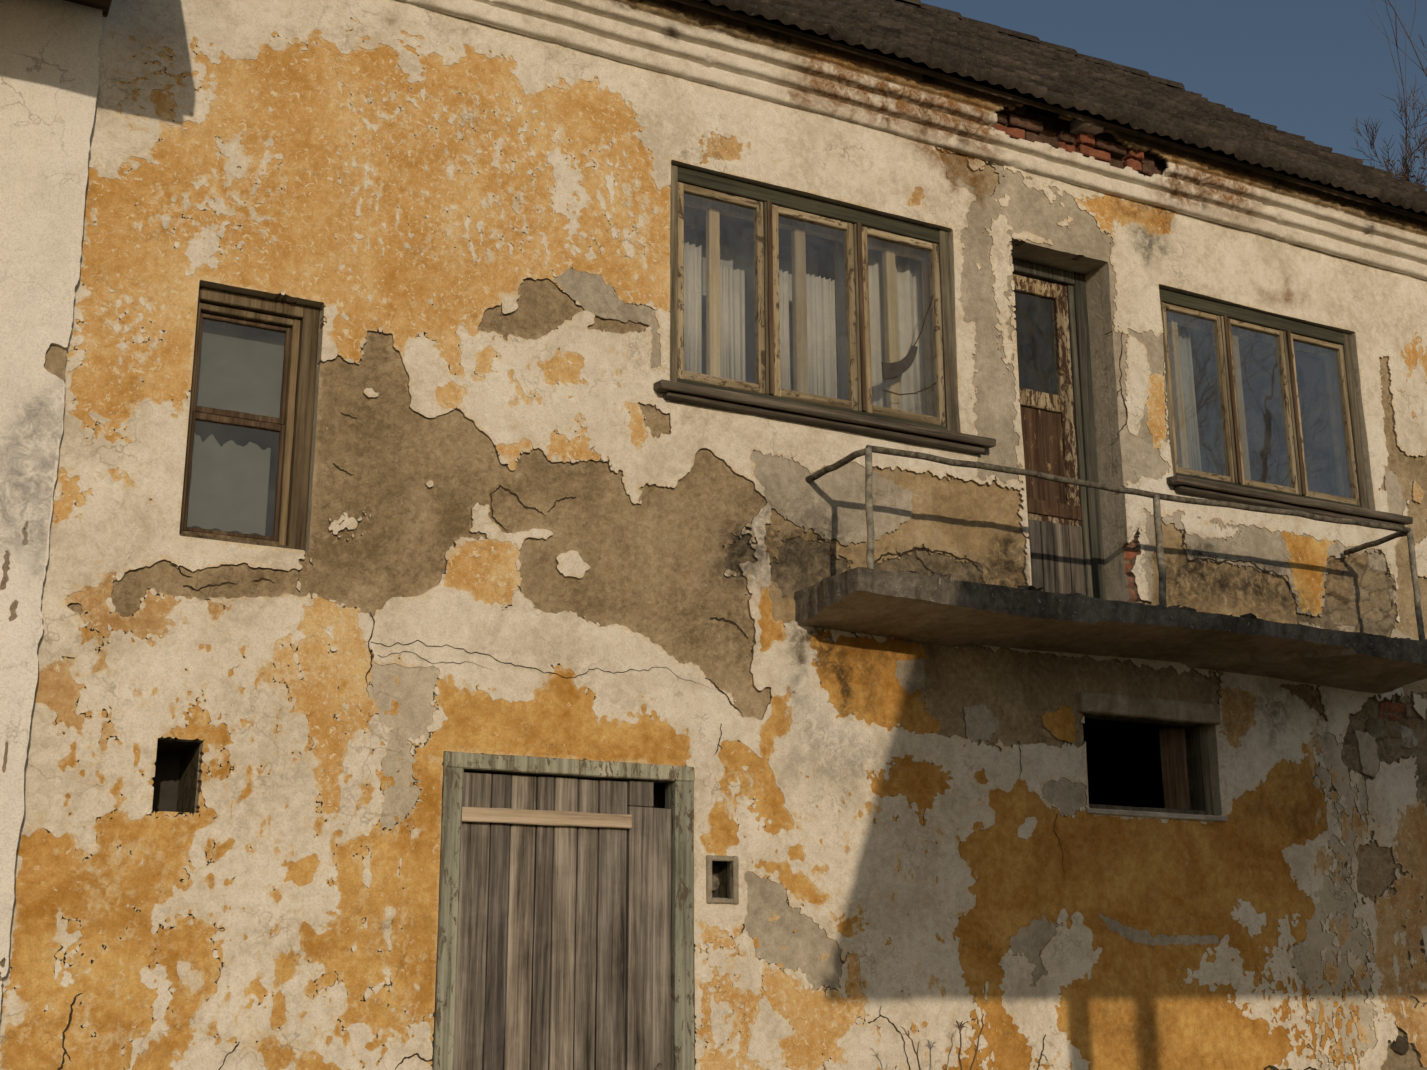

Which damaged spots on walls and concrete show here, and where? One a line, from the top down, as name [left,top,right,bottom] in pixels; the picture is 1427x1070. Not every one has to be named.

flaking render [993,106,1167,177]
spalling [1117,326,1427,640]
crack [169,561,274,591]
peeling [0,18,1027,1070]
spalling [809,630,1258,751]
peeling [838,679,1427,1070]
crack [57,993,83,1070]